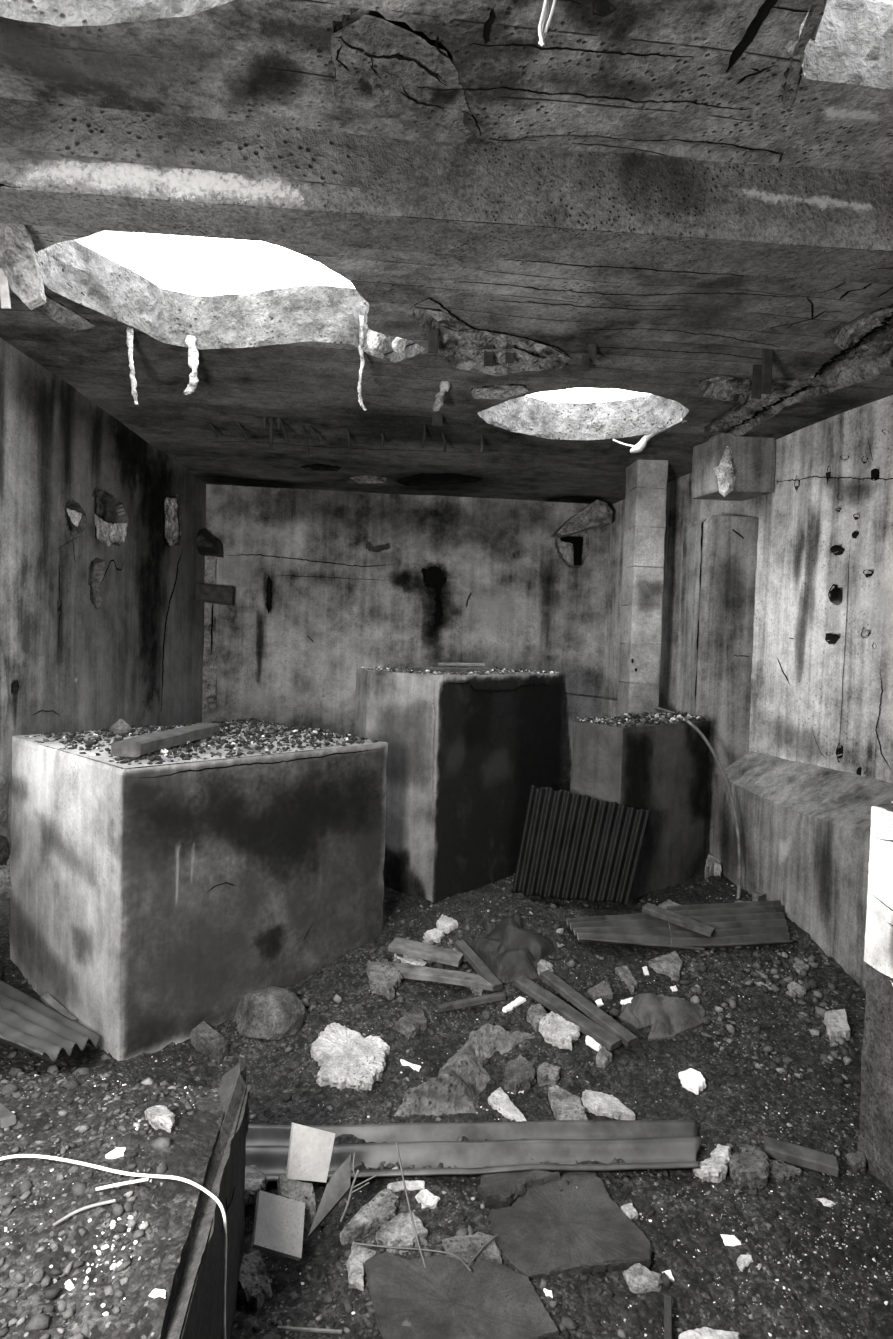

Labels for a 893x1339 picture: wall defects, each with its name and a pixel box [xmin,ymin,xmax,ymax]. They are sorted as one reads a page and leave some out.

crack [335,9,774,110]
spalling [783,0,824,111]
spalling [36,294,95,332]
spalling [697,304,893,442]
crack [776,437,893,483]
water stain [394,565,446,592]